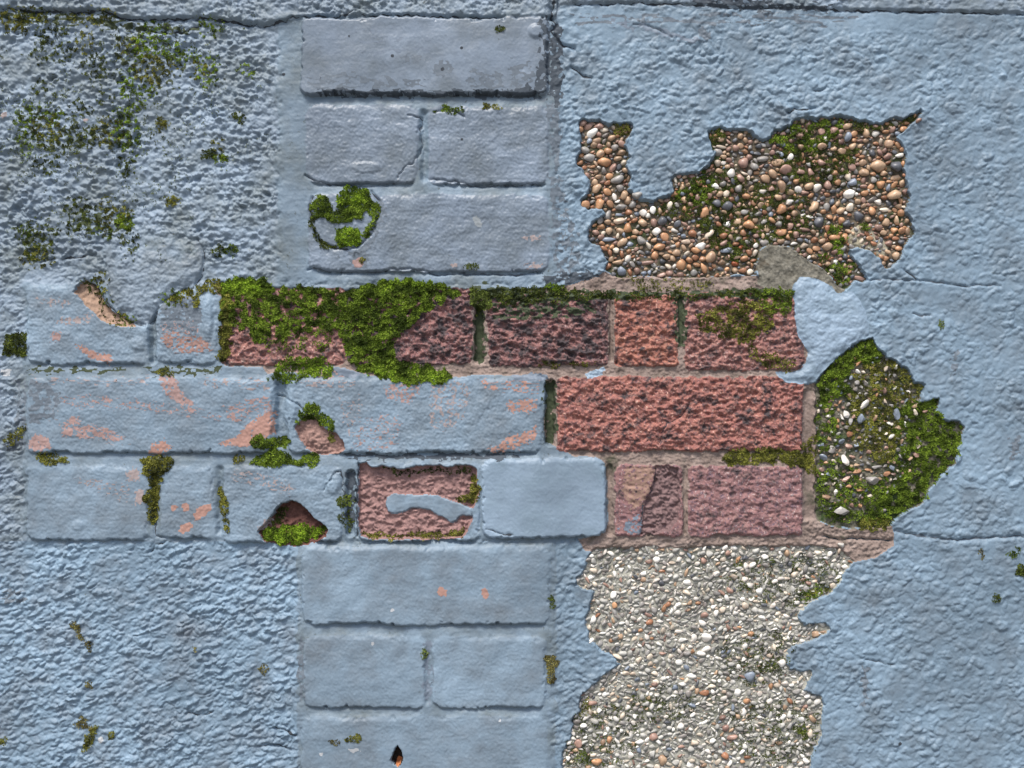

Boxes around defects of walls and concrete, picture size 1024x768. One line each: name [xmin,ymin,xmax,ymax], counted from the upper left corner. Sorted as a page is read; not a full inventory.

peeling [36,271,894,562]